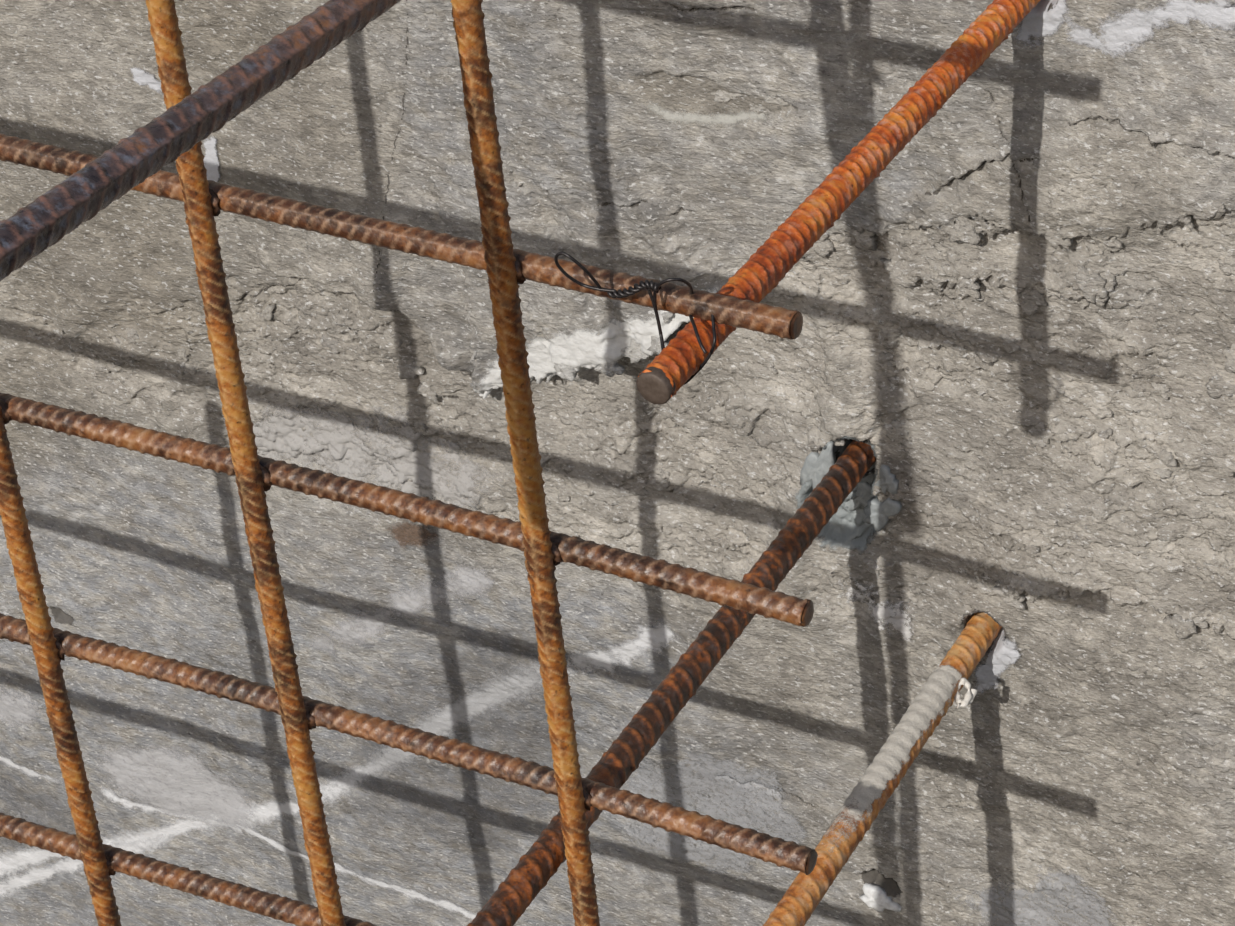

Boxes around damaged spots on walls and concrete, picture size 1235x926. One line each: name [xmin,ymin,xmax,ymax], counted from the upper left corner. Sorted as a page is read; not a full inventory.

crack [925,91,1037,222]
leakage [1016,0,1235,57]
spalling [0,0,818,926]
spalling [526,0,1235,640]
spalling [762,612,1002,926]